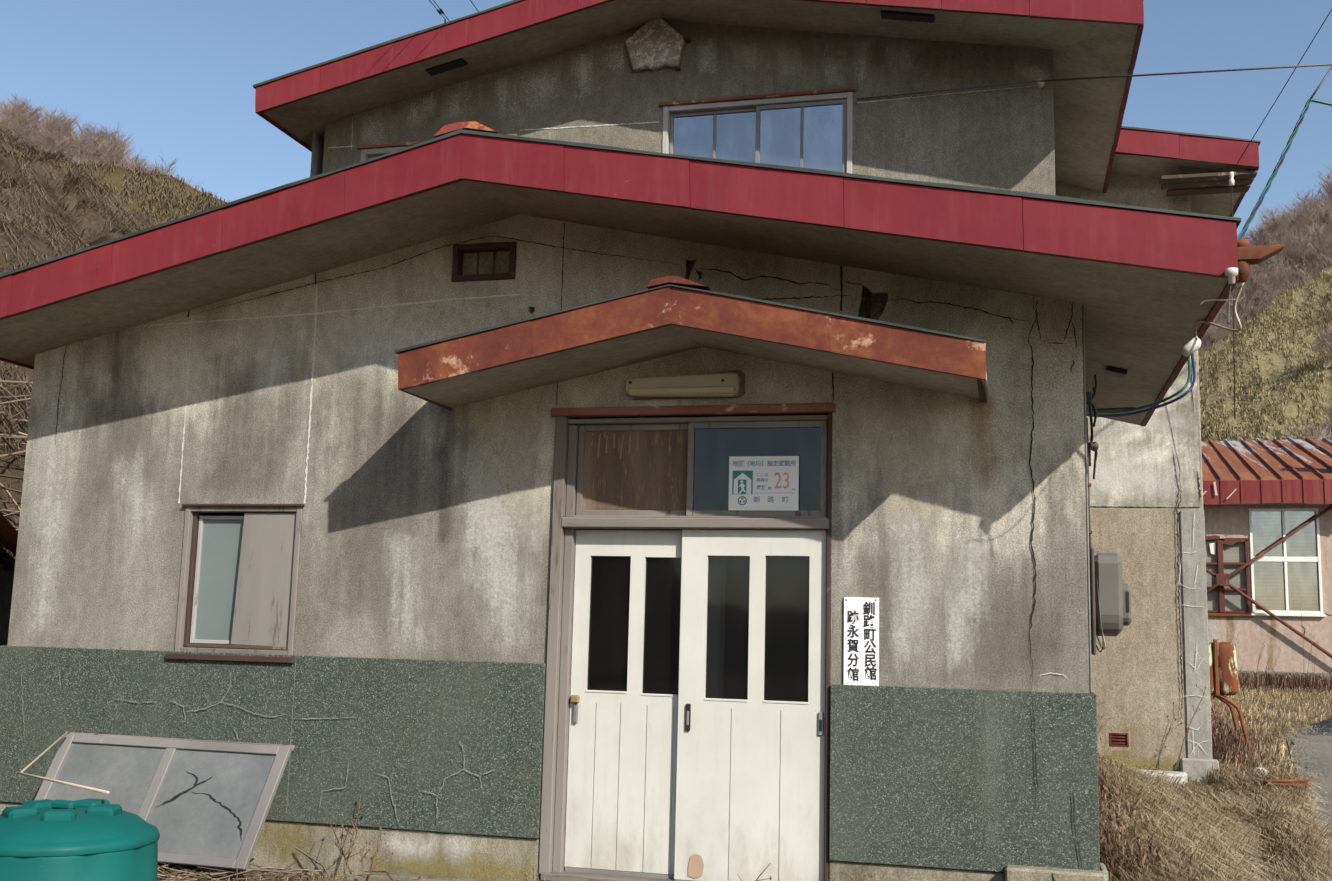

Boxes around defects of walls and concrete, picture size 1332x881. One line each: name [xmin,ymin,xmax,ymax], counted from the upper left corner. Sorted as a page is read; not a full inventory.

water stain [39,374,65,622]
water stain [465,453,530,632]
crack [198,236,1077,804]
water stain [890,518,925,651]
water stain [949,545,982,660]
water stain [1089,461,1180,493]
water stain [1101,416,1178,431]
crack [1052,796,1082,881]